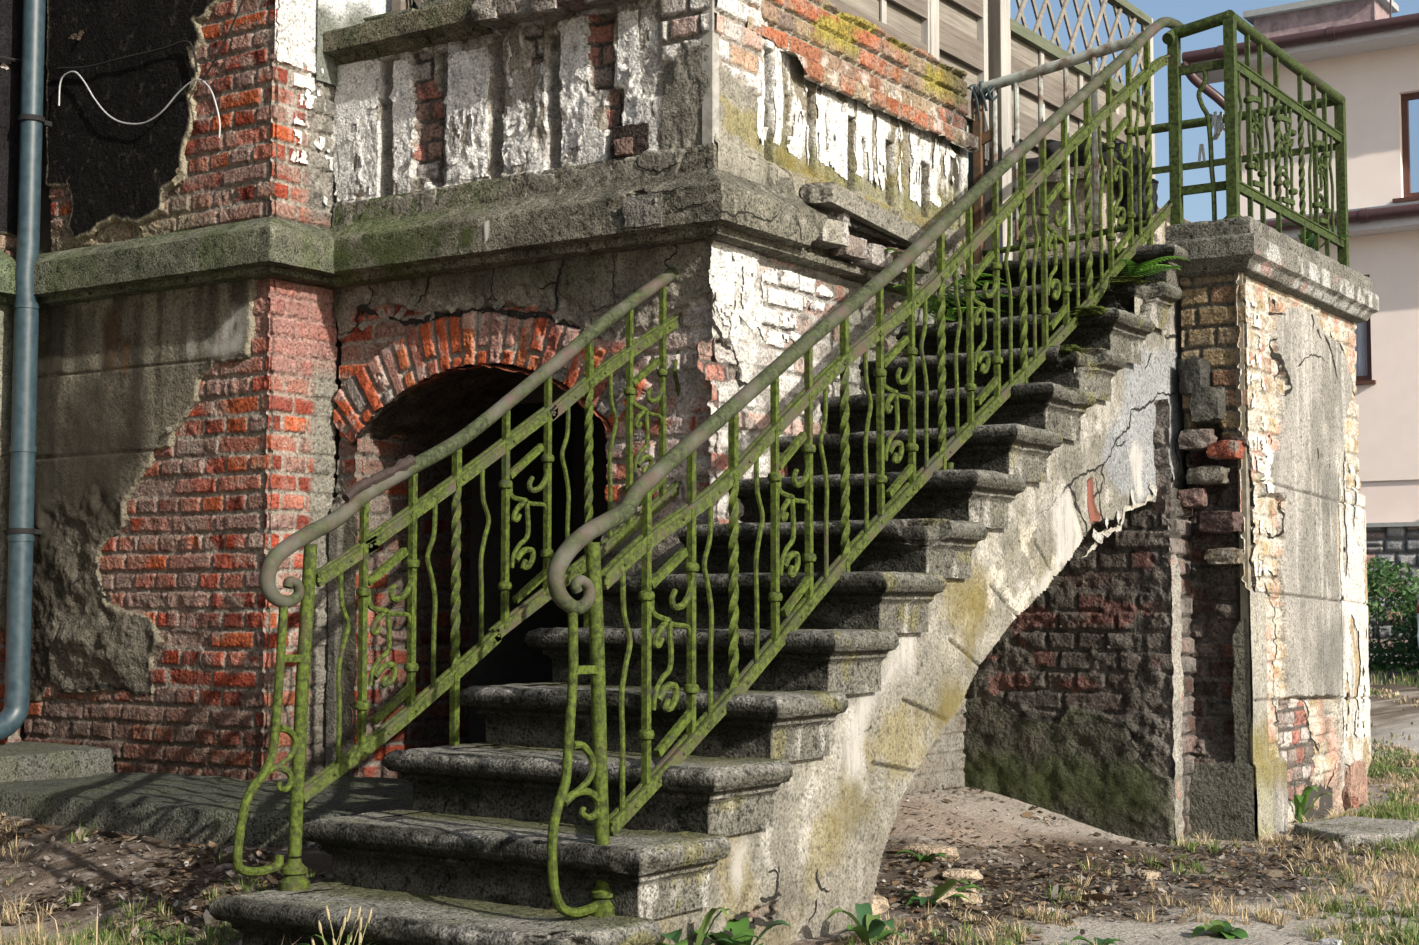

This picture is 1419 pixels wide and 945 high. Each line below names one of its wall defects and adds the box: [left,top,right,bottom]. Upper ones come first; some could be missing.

flaking render [49,0,649,252]
flaking render [747,0,979,277]
crack [336,285,373,336]
crack [417,277,430,303]
peeling [696,244,833,382]
flaking render [0,278,277,781]
crack [1041,334,1178,539]
peeling [1337,451,1370,739]
flaking render [1276,698,1315,801]
spalling [1342,760,1368,808]